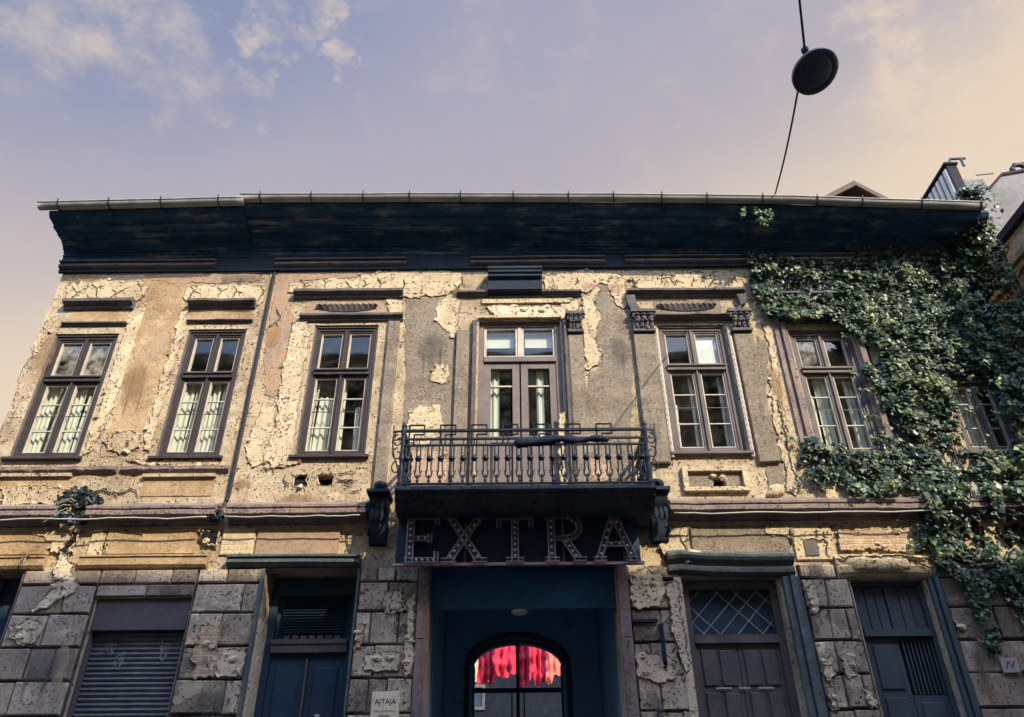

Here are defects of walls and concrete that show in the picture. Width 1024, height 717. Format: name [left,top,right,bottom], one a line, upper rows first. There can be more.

crack [71,281,145,298]
peeling [485,268,746,371]
peeling [65,277,267,467]
peeling [244,321,336,489]
peeling [430,363,451,385]
spalling [0,484,78,505]
spalling [8,527,81,647]
spalling [190,623,248,680]
spalling [629,567,691,684]
spalling [836,525,928,555]